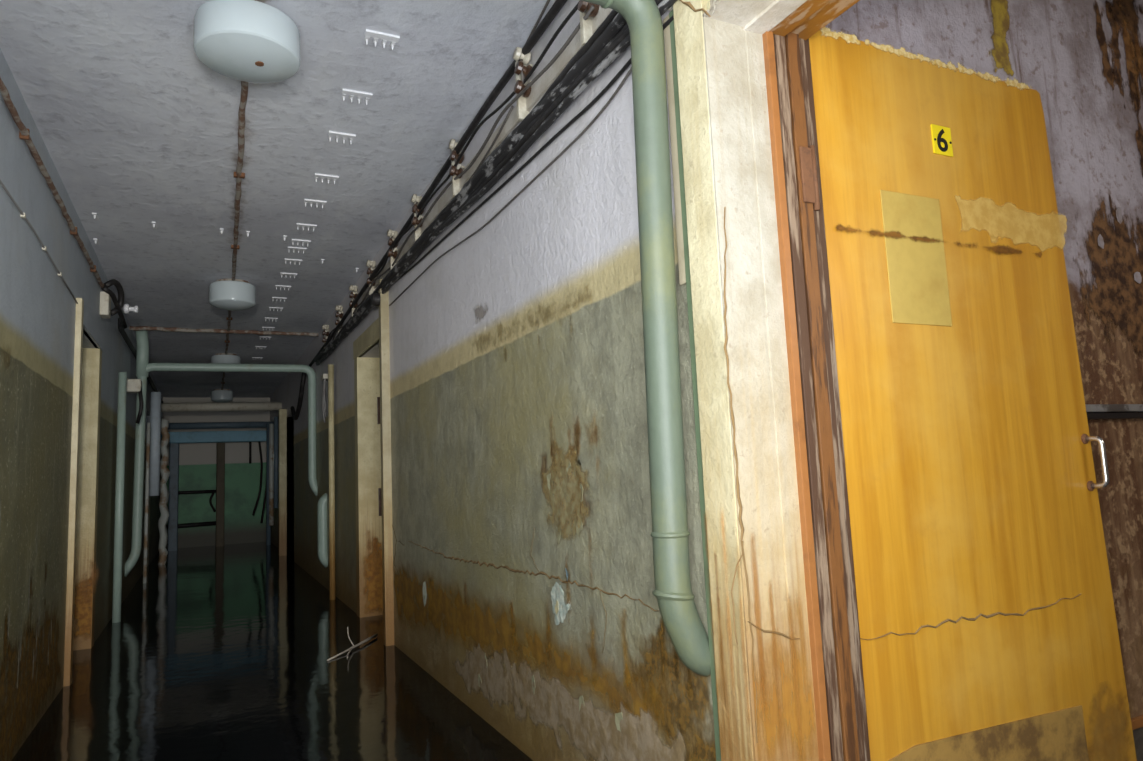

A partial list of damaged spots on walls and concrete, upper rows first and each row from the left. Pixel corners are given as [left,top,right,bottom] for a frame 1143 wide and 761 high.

peeling [1073,195,1143,357]
peeling [542,424,588,544]
crack [724,207,800,743]
crack [392,525,660,653]
water stain [632,619,716,761]